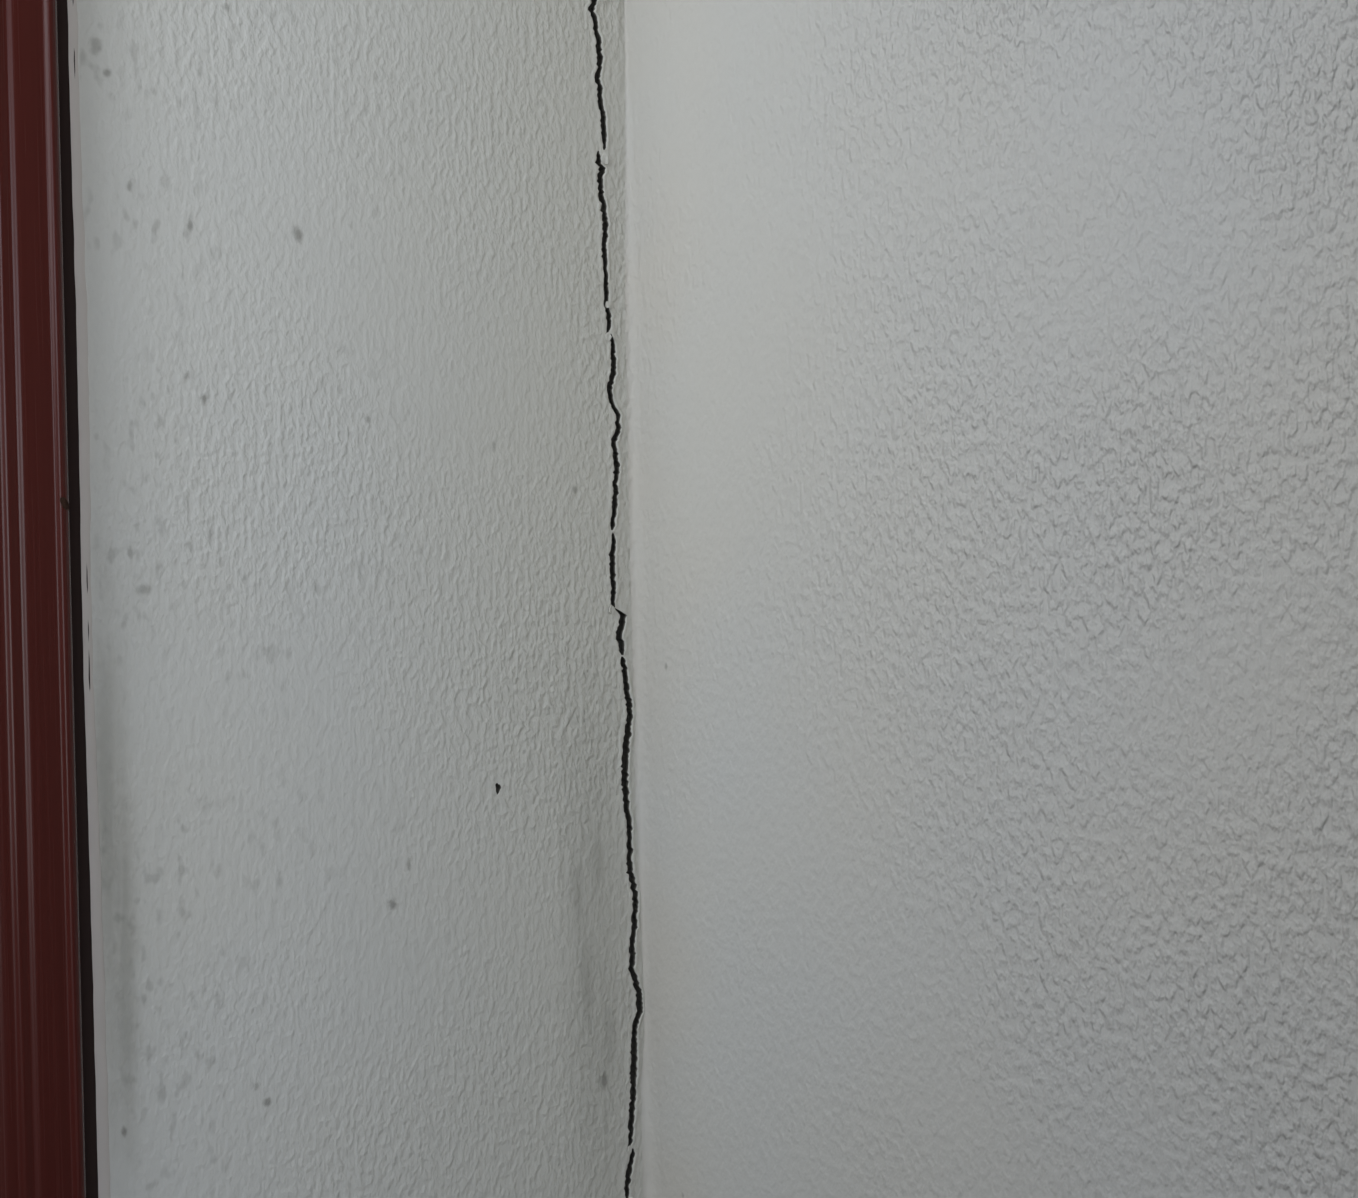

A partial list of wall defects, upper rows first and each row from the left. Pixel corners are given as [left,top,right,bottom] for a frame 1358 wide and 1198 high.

crack [584,0,645,1198]